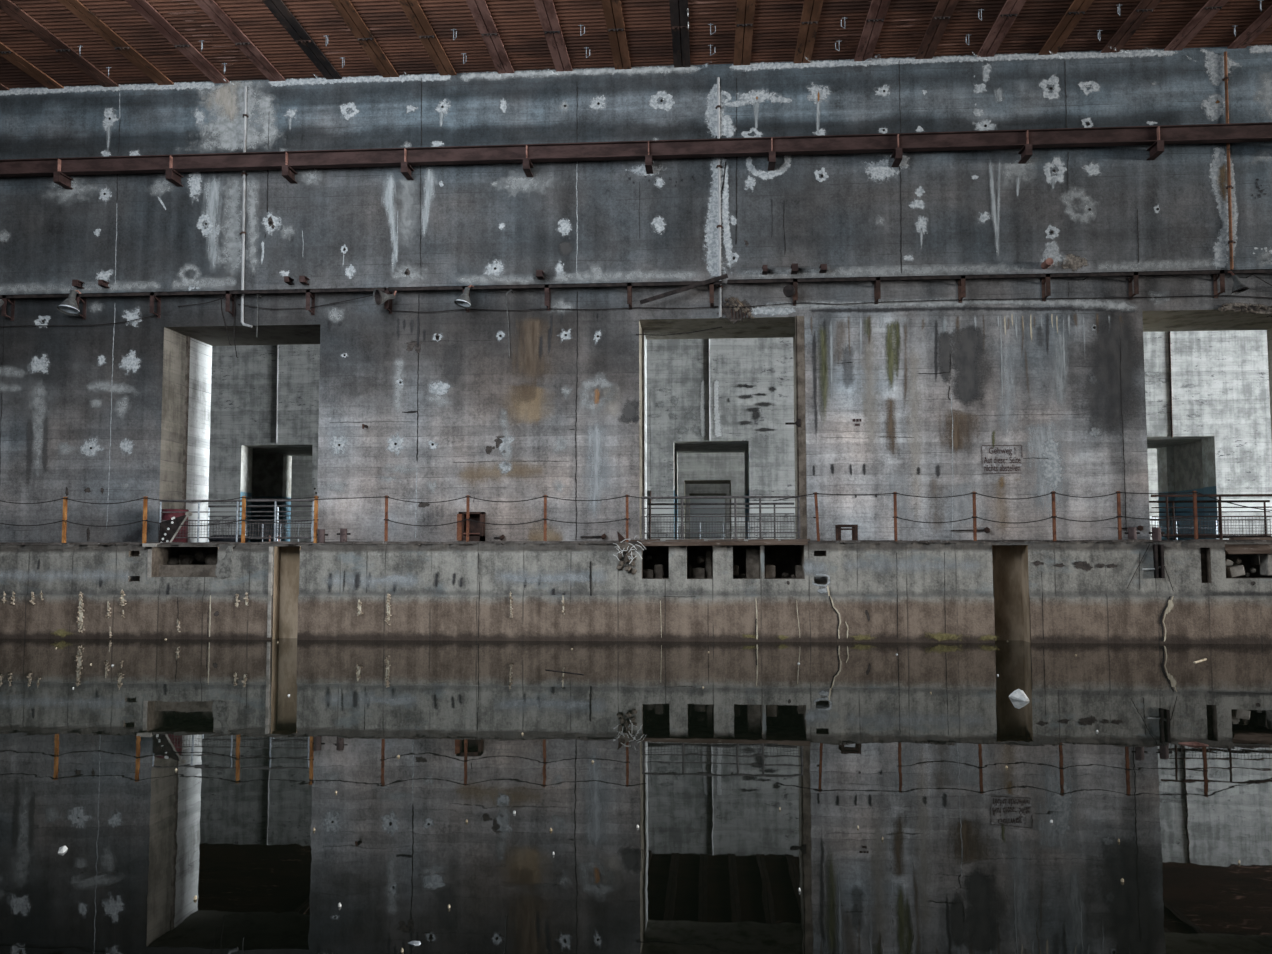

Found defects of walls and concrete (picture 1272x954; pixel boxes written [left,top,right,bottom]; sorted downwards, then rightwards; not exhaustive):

water stain [385,174,419,279]
water stain [750,298,1137,451]
water stain [1028,422,1069,513]
crack [827,585,849,639]